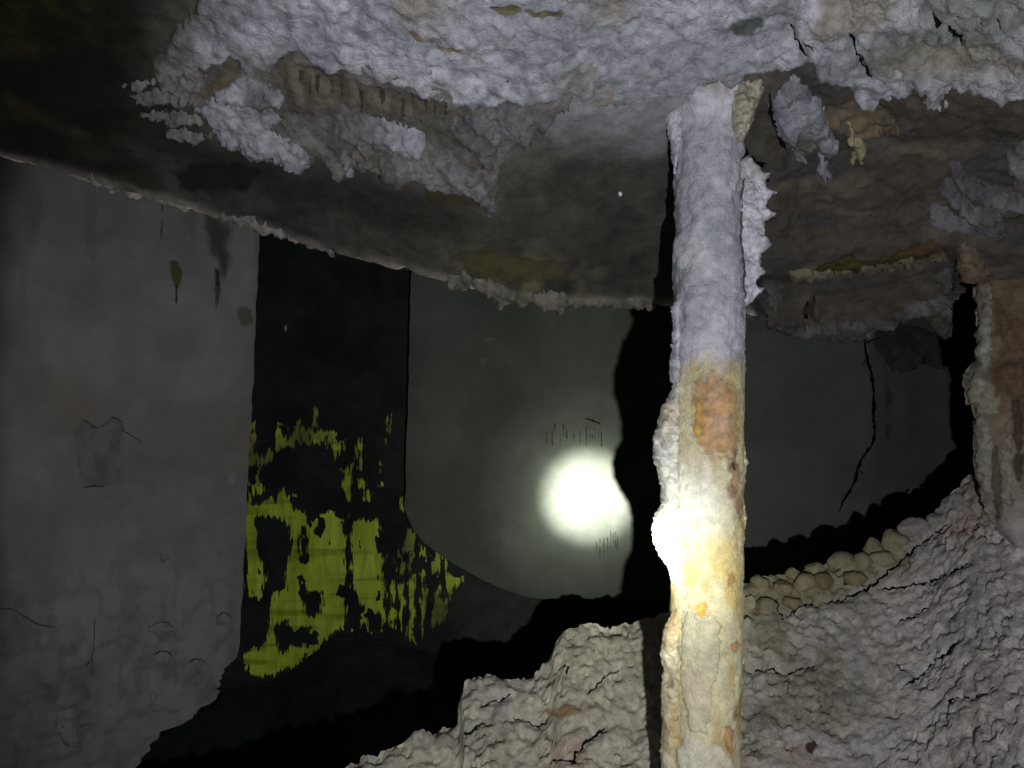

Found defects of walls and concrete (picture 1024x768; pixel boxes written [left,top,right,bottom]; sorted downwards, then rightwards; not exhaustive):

crack [790,24,814,57]
crack [849,34,873,80]
crack [932,12,963,46]
damp [152,0,1024,213]
peeling [122,58,557,217]
corrosion [694,376,742,519]
crack [838,337,882,514]
crack [774,524,973,625]
crack [748,665,817,691]
crack [897,640,961,690]
crack [464,694,549,744]
crack [550,726,607,764]